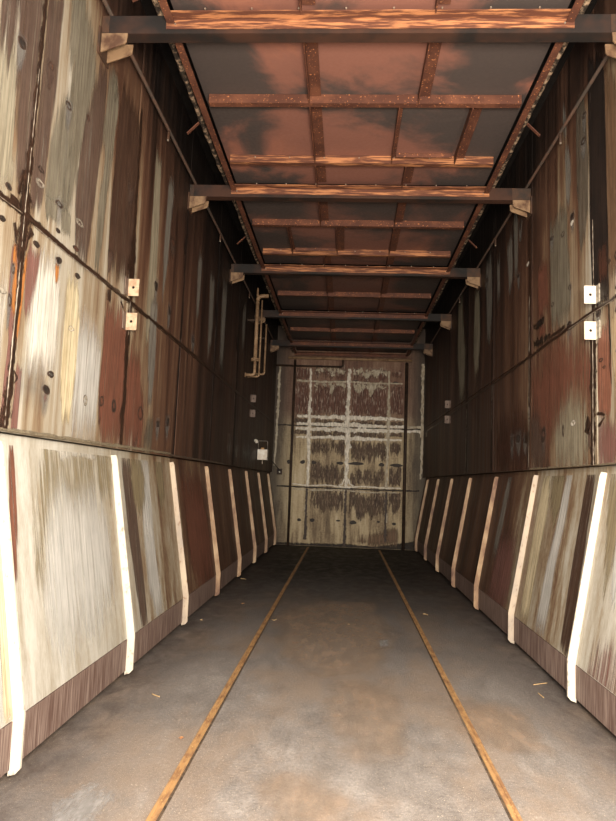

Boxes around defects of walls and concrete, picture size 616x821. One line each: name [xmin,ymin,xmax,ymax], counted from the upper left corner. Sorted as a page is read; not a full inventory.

corrosion [107,87,141,283]
corrosion [604,64,616,277]
corrosion [0,244,41,429]
leakage [292,364,433,521]